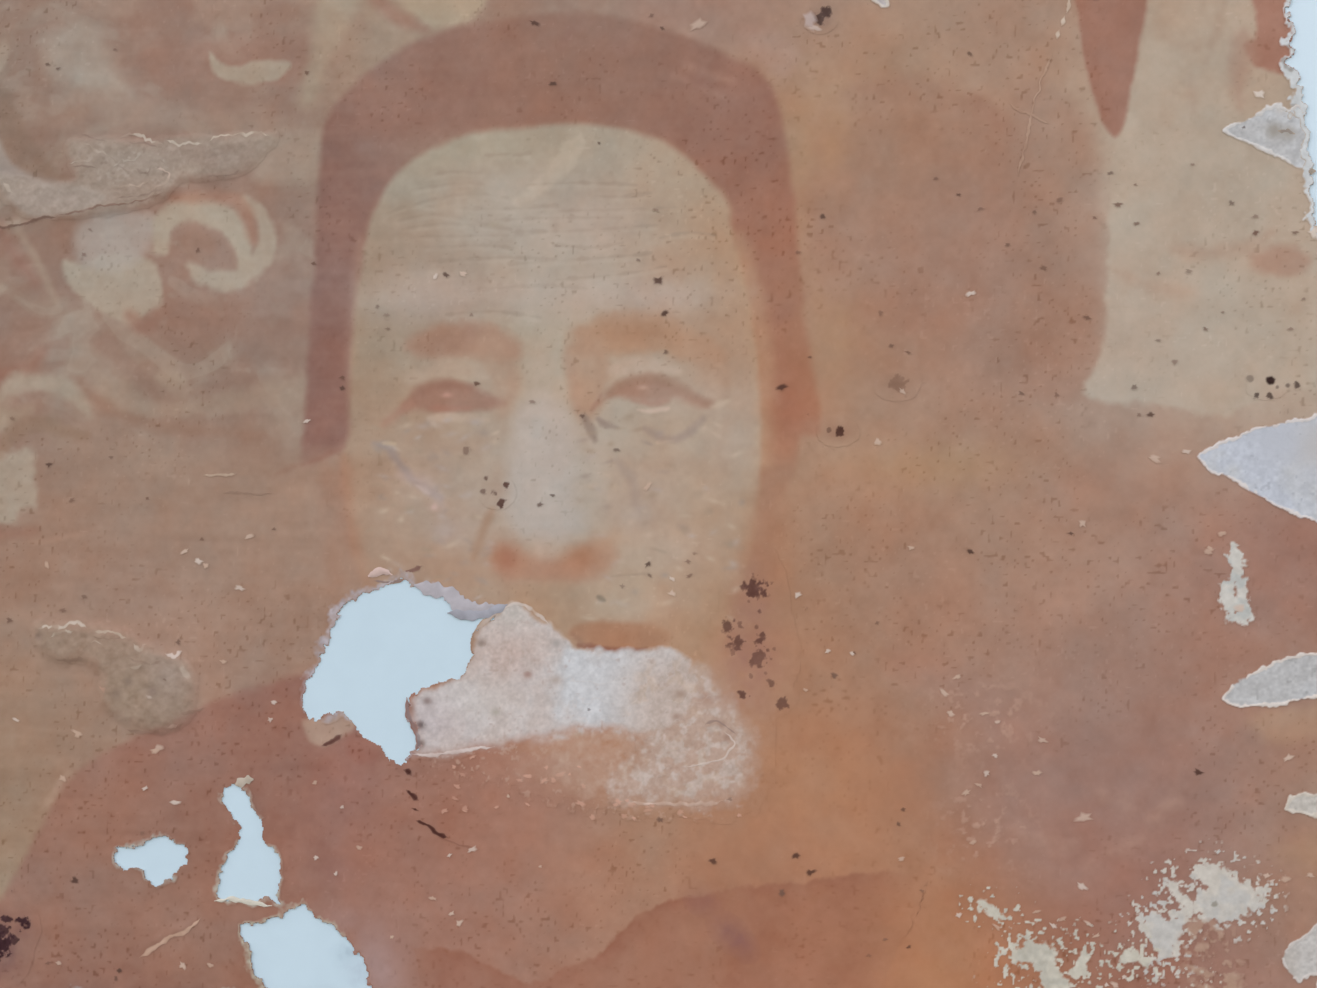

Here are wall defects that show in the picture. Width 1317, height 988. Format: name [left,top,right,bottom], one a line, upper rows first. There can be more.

peeling [1222,89,1305,169]
crack [0,192,163,229]
peeling [1181,412,1317,523]
peeling [1203,531,1256,628]
flaking render [302,578,495,765]
peeling [1221,652,1317,709]
peeling [1284,791,1317,820]
flaking render [114,836,188,887]
flaking render [216,783,372,988]
peeling [955,838,1317,988]